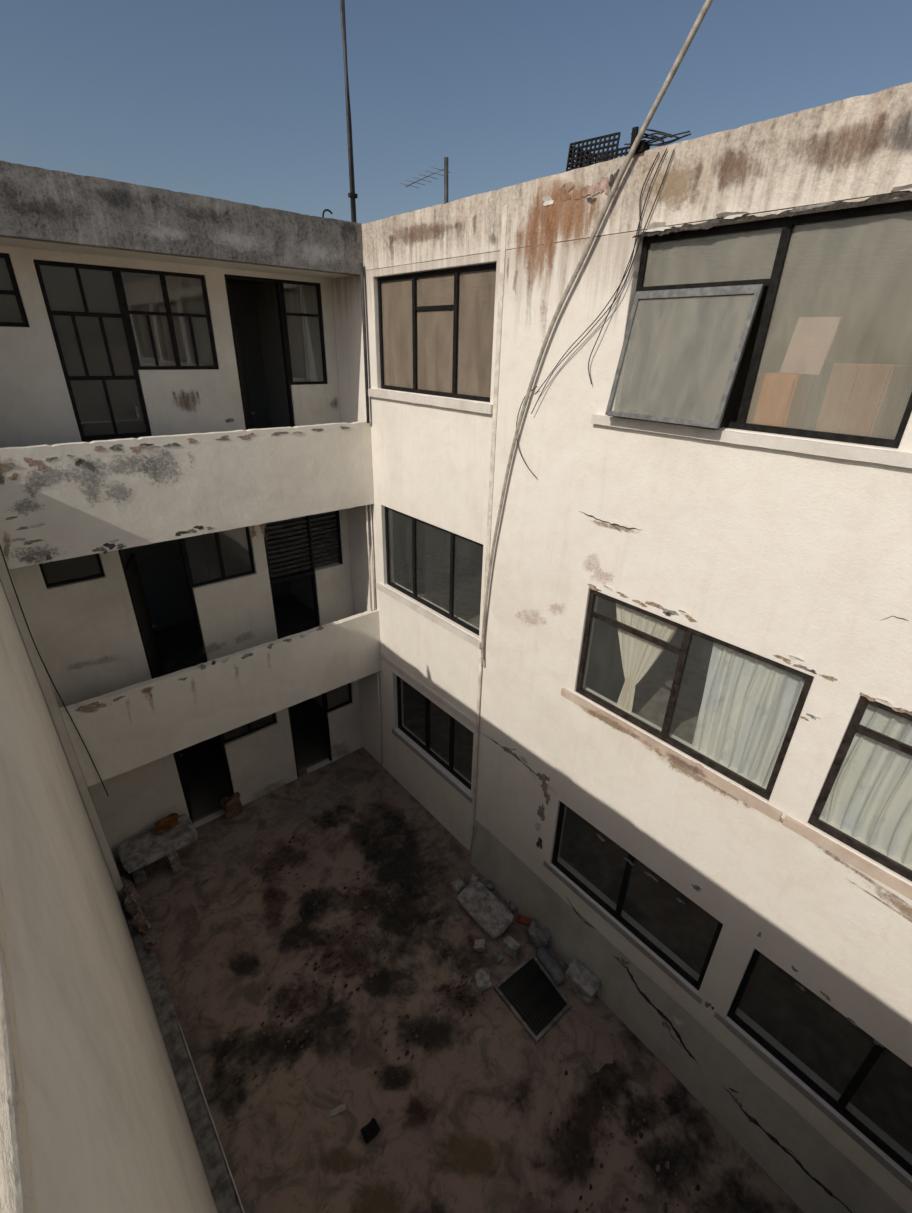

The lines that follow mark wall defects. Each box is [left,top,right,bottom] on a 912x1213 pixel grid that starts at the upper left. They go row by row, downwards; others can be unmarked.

damp [813,112,912,165]
damp [655,163,702,209]
damp [720,150,760,185]
corrosion [517,182,593,279]
peeling [0,438,197,485]
peeling [4,499,59,563]
peeling [175,526,213,536]
peeling [588,584,698,622]
peeling [774,655,837,682]
crack [481,733,552,789]
crack [614,956,700,1067]
crack [722,1085,852,1213]